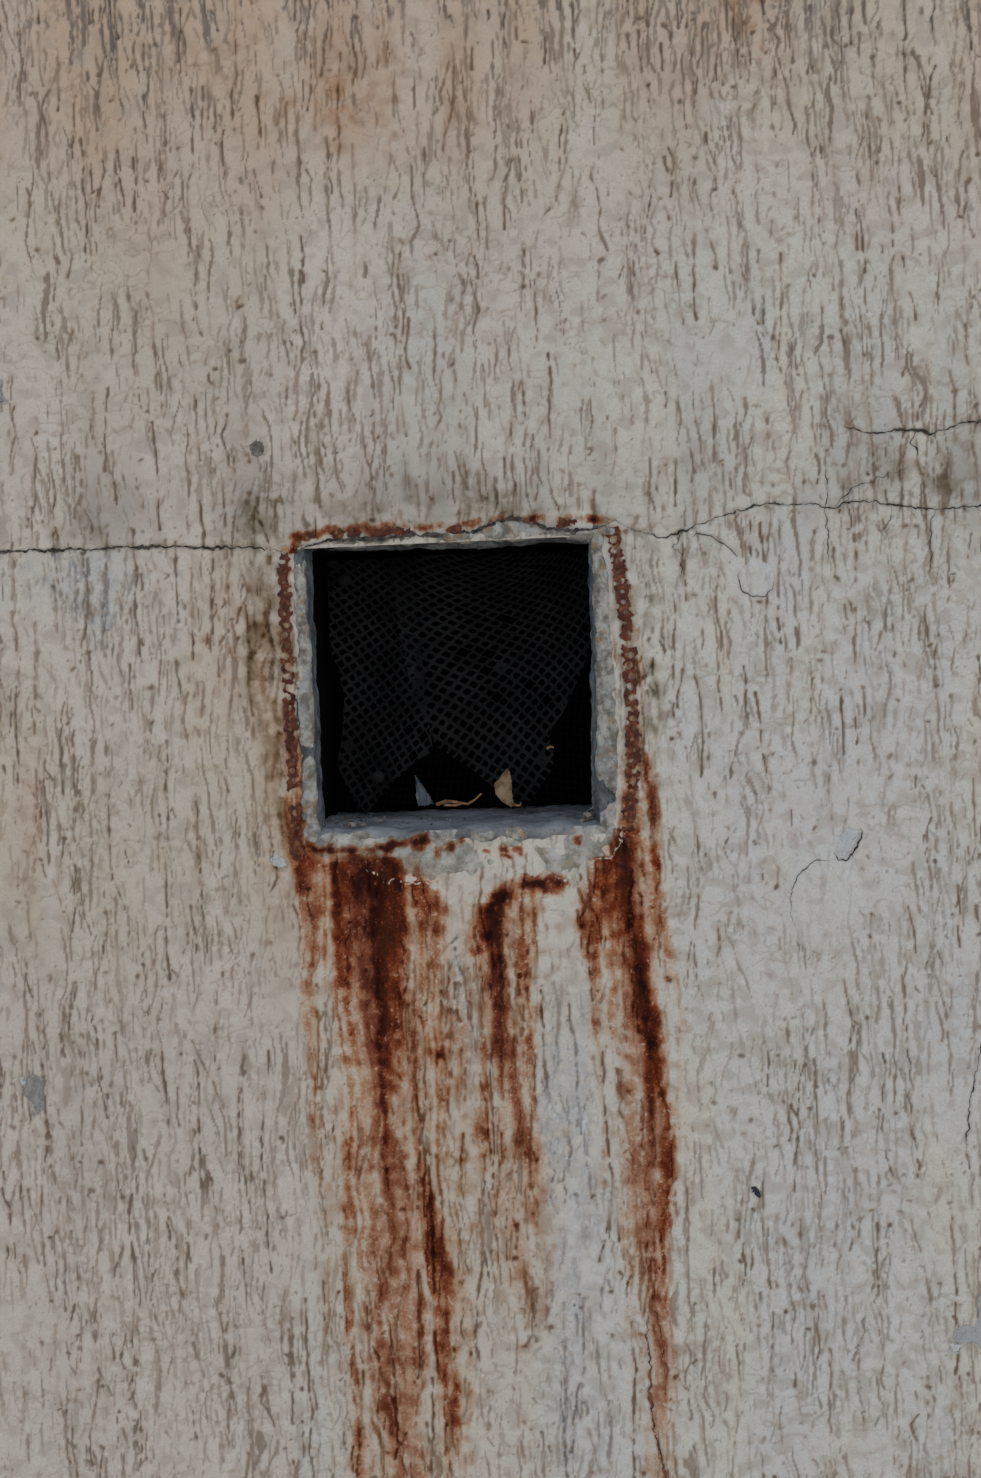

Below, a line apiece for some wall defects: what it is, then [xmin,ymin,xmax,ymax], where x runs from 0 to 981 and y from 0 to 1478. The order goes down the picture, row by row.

corrosion [290,524,387,554]
crack [0,420,981,579]
peeling [19,1075,46,1115]
corrosion [294,809,463,1426]
corrosion [475,873,566,1162]
corrosion [578,762,674,1395]
corrosion [375,1343,406,1470]